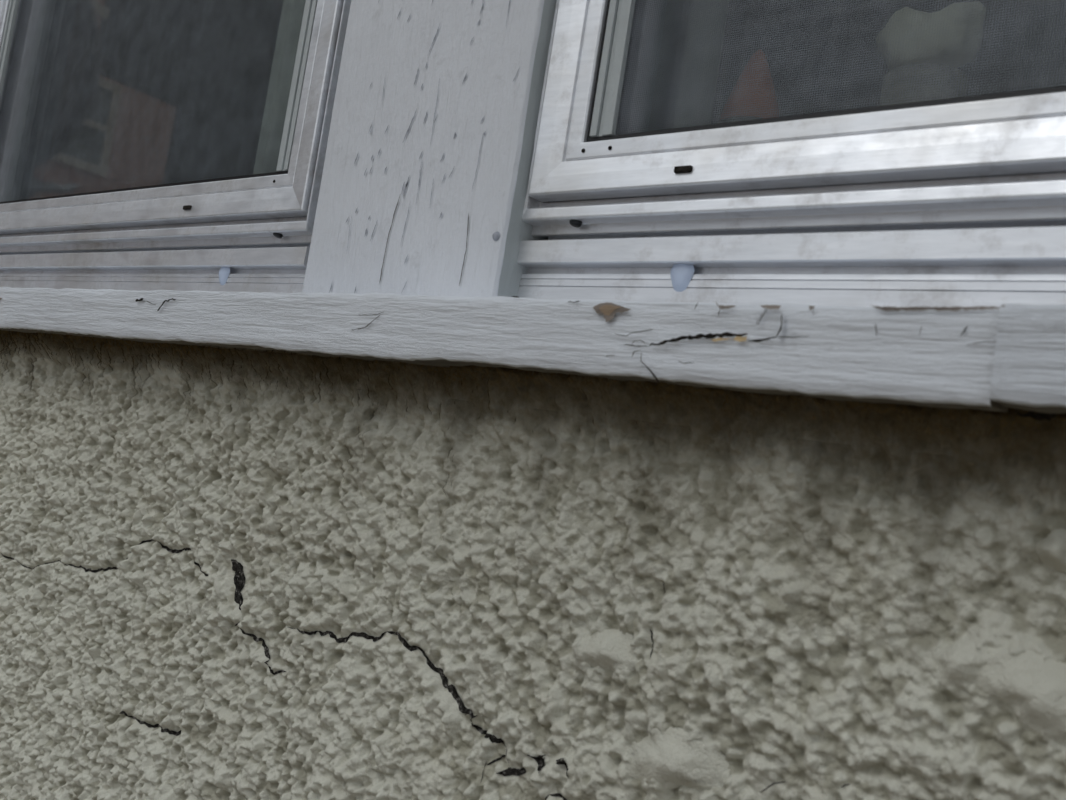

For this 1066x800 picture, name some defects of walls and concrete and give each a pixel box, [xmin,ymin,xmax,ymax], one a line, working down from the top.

peeling [593,302,630,322]
crack [605,303,810,382]
crack [1,539,286,675]
crack [120,711,181,736]
crack [289,627,509,784]
crack [545,792,567,800]